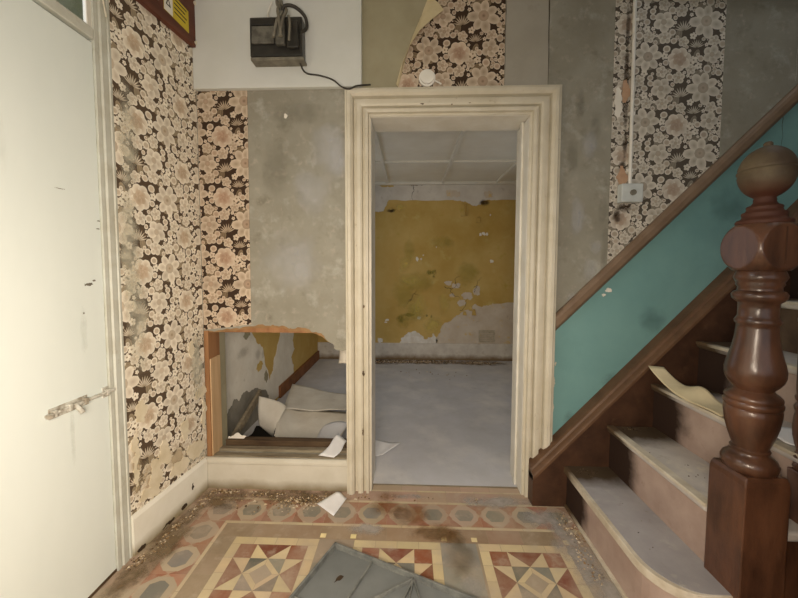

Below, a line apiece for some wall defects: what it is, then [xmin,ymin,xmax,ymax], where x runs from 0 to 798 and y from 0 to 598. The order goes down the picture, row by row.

peeling [375,185,516,212]
peeling [400,281,514,344]
flaking render [203,319,347,459]